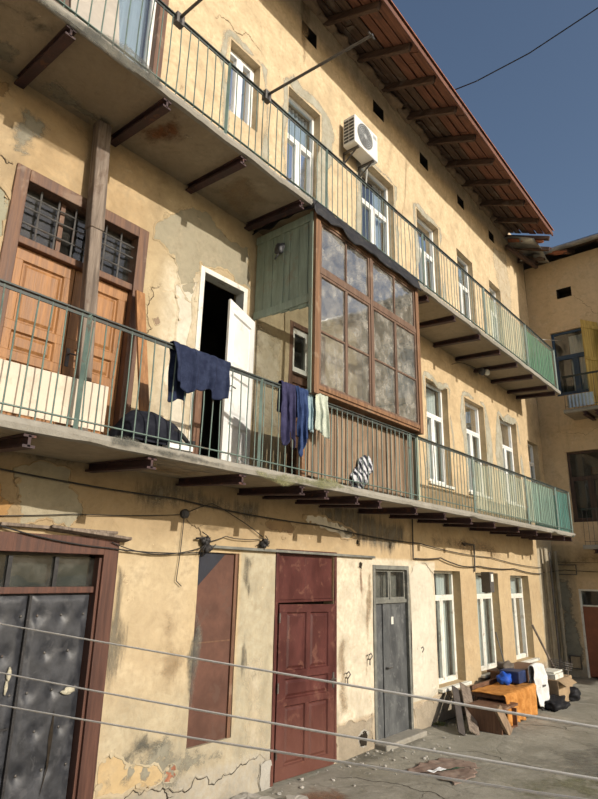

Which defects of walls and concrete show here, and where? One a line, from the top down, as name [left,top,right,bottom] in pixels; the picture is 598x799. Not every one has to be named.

flaking render [0,174,11,251]
flaking render [152,205,252,347]
flaking render [160,352,188,445]
flaking render [0,459,85,529]
flaking render [261,513,359,546]
flaking render [94,750,179,799]
crack [122,754,265,799]